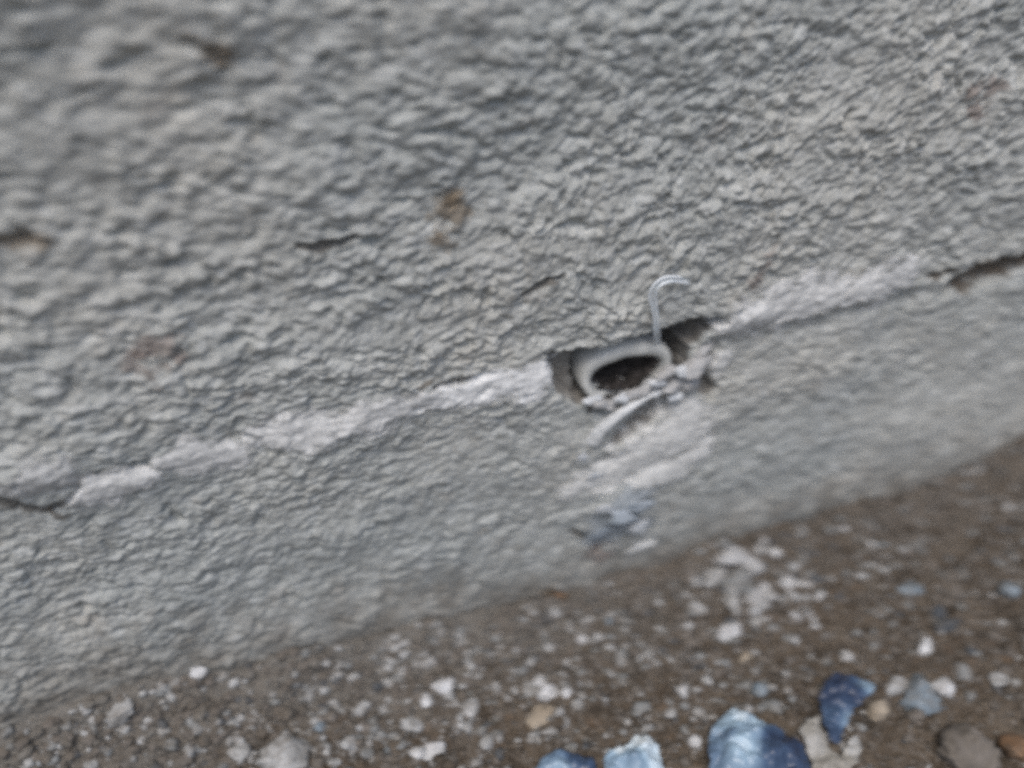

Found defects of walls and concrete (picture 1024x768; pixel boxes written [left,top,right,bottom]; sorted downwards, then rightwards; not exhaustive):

crack [523,274,563,294]
crack [433,371,490,388]
spalling [546,316,725,461]
crack [0,488,76,520]
peeling [581,483,661,546]